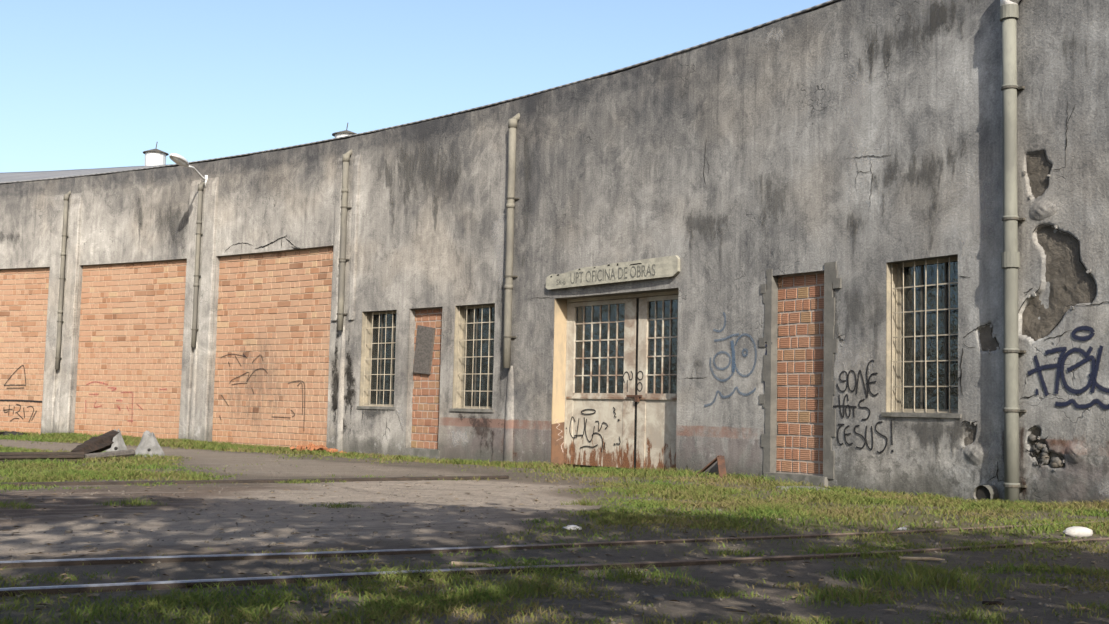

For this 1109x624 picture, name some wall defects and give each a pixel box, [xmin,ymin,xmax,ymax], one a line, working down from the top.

damp [859,2,955,68]
damp [875,142,966,209]
flaking render [1023,150,1052,199]
flaking render [1018,224,1097,341]
flaking render [975,323,1000,354]
flaking render [1028,426,1074,471]